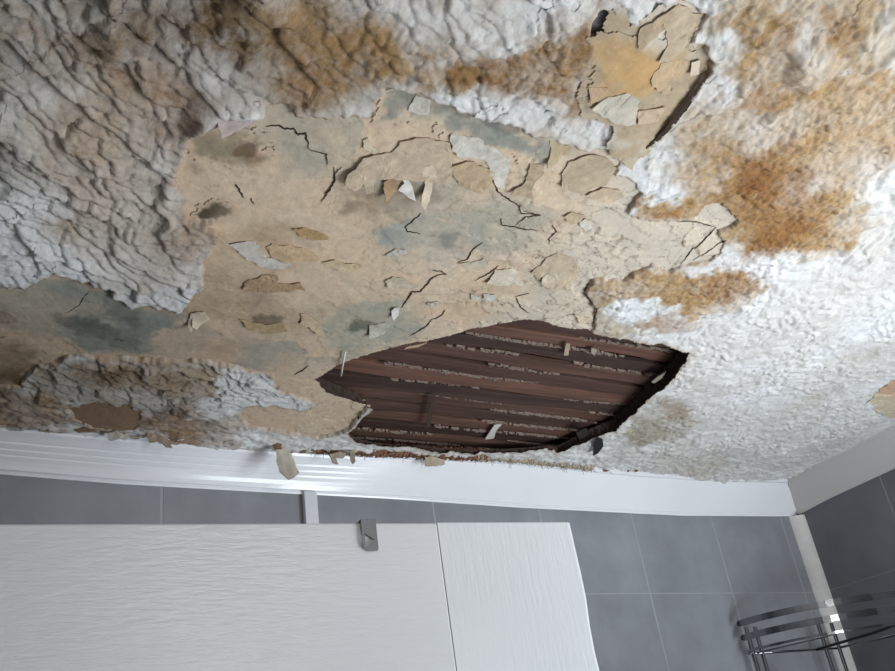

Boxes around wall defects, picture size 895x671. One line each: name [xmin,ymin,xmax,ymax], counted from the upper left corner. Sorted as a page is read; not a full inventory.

crack [266,125,342,202]
damp [585,0,895,340]
damp [0,0,709,450]
peeling [118,0,737,436]
crack [495,185,557,243]
crack [680,221,727,261]
crack [402,243,482,307]
crack [584,284,598,328]
peeling [870,380,895,418]